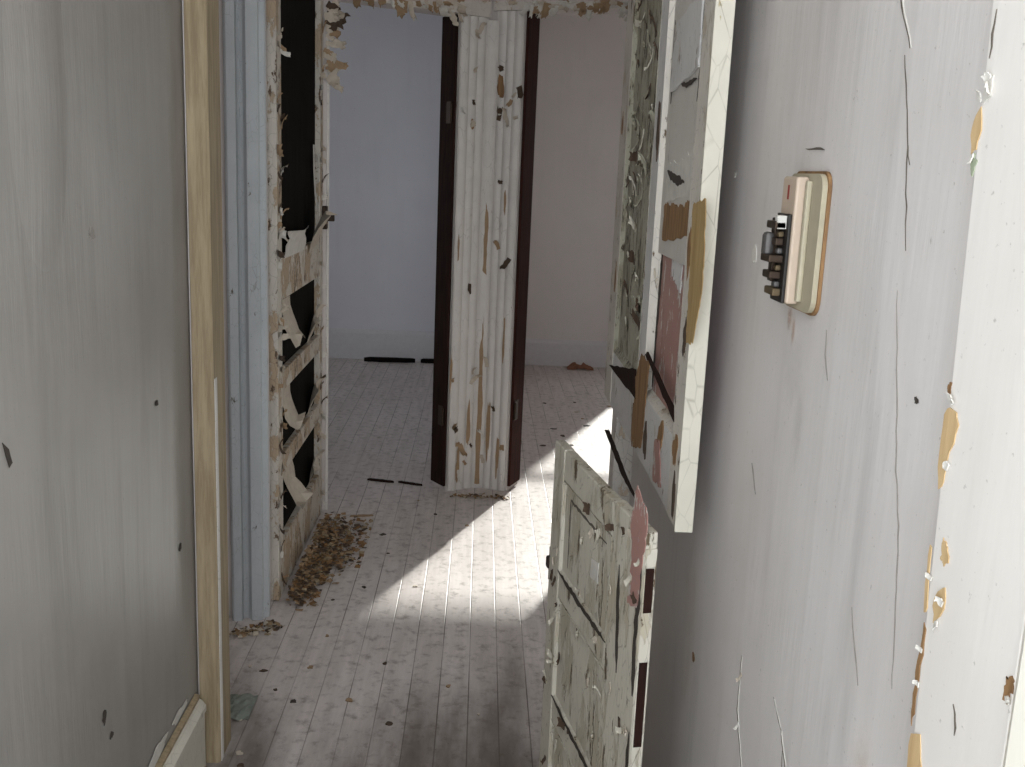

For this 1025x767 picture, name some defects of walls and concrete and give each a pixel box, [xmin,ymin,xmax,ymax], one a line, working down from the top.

peeling [277,28,291,57]
peeling [320,0,468,105]
peeling [512,0,658,70]
peeling [496,65,523,128]
peeling [621,83,661,232]
peeling [482,204,511,274]
peeling [452,318,504,484]